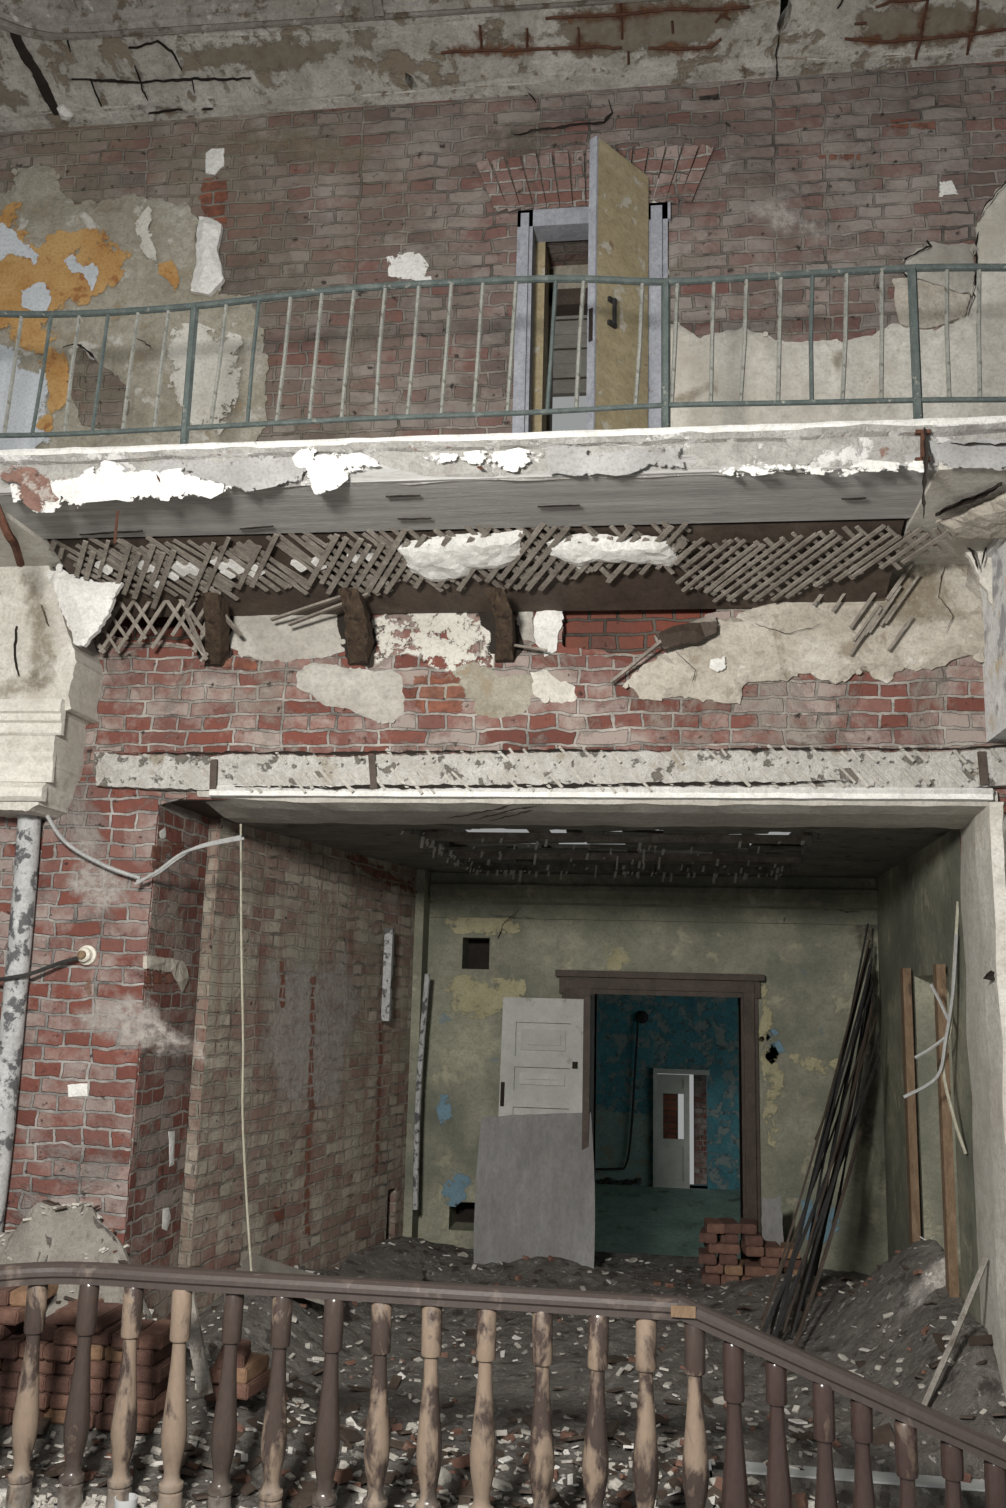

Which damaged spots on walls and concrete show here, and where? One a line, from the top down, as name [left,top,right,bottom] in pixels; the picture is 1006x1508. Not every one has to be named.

crack [10,32,251,115]
crack [514,93,613,136]
spalling [199,177,228,223]
spalling [118,455,307,492]
crack [922,427,1006,519]
spalling [222,658,257,670]
spalling [408,671,465,717]